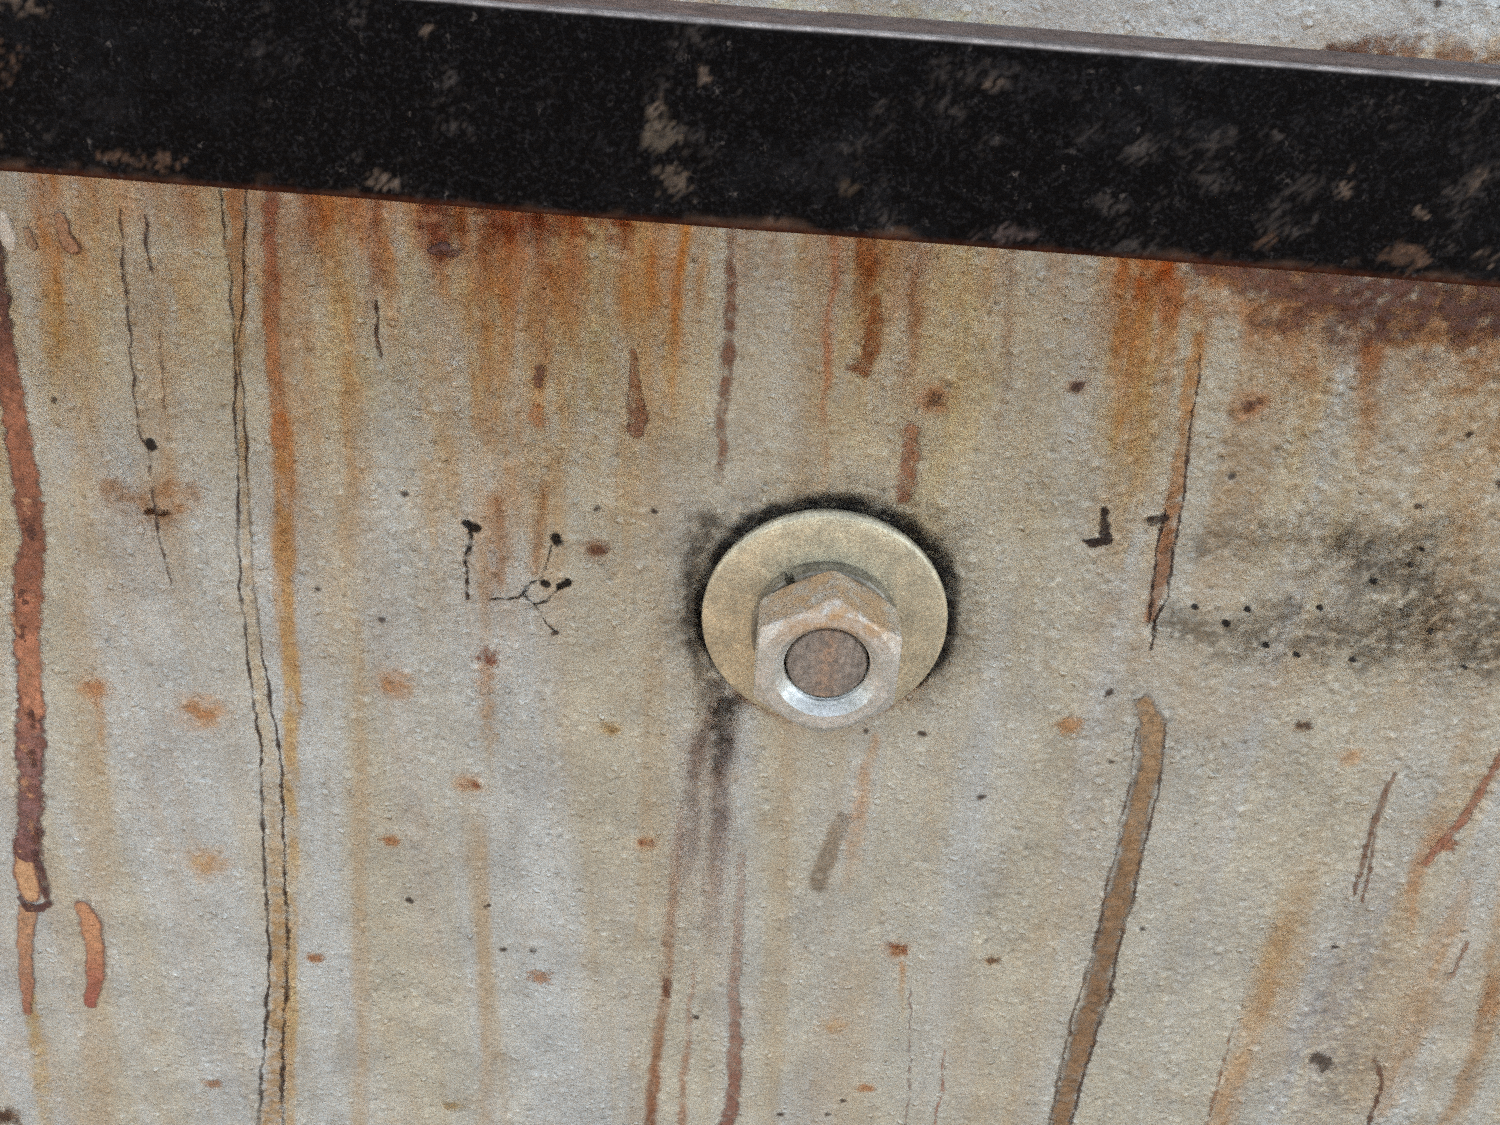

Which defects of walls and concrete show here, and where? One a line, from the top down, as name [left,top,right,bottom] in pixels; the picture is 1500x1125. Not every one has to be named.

rust [220,189,286,525]
rust [374,300,383,357]
rust [627,349,648,438]
rust [717,253,736,465]
rust [1192,264,1500,344]
rust [1147,357,1201,650]
rust [0,243,52,1015]
rust [75,901,105,1008]
rust [244,626,290,1103]
rust [720,939,743,1125]
rust [1048,696,1166,1125]
rust [1423,754,1500,866]